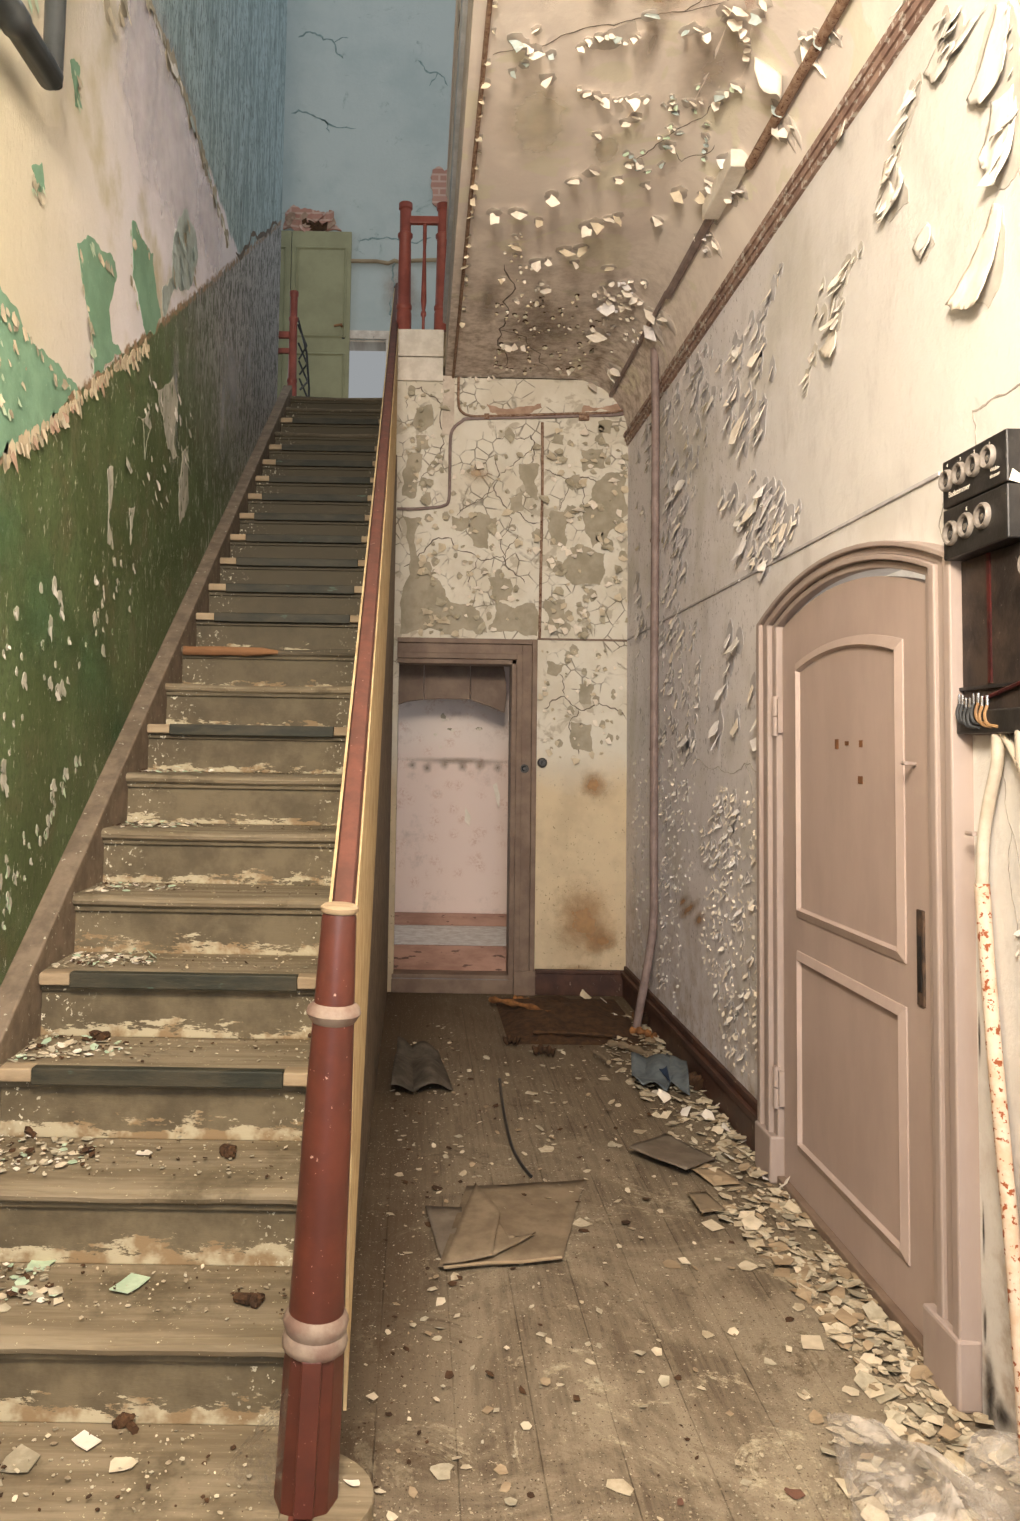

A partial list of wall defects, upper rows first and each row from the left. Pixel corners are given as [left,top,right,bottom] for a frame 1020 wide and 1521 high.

peeling [32,163,47,205]
peeling [70,58,83,111]
peeling [794,27,843,78]
peeling [873,1,1020,311]
peeling [799,241,863,397]
peeling [0,209,198,701]
crack [404,435,596,583]
peeling [400,0,802,990]
peeling [0,749,82,930]
peeling [699,789,757,1073]